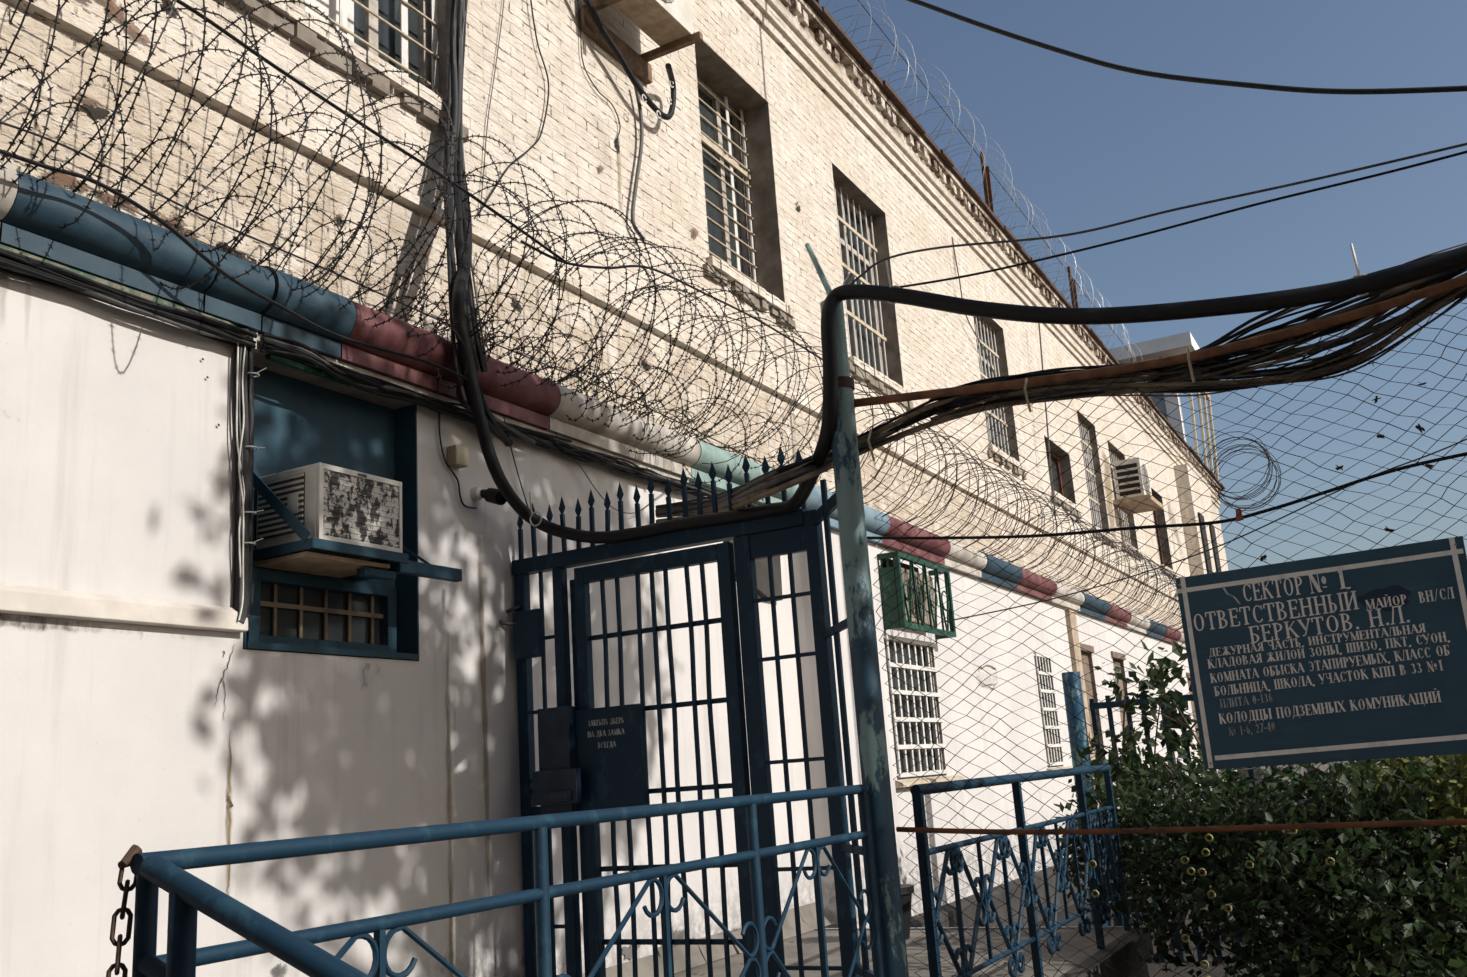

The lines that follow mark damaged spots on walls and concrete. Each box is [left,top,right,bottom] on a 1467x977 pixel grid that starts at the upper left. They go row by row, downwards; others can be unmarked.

crack [216,646,234,894]